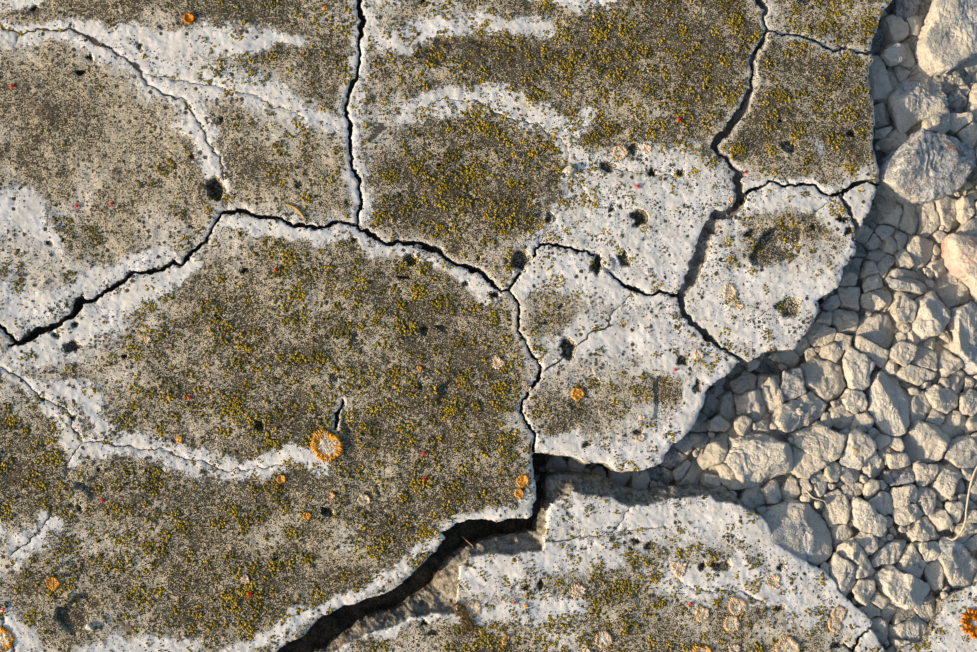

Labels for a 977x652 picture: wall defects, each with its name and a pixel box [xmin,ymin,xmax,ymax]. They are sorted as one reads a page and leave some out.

spalling [344,65,363,199]
crack [0,0,881,365]
spalling [659,0,873,326]
spalling [0,175,237,354]
crack [0,367,299,478]
spalling [692,331,844,421]
crack [10,507,52,556]
crack [277,334,563,652]
spalling [314,439,781,652]
crack [544,509,662,542]
crack [680,582,779,613]
spalling [925,468,977,532]